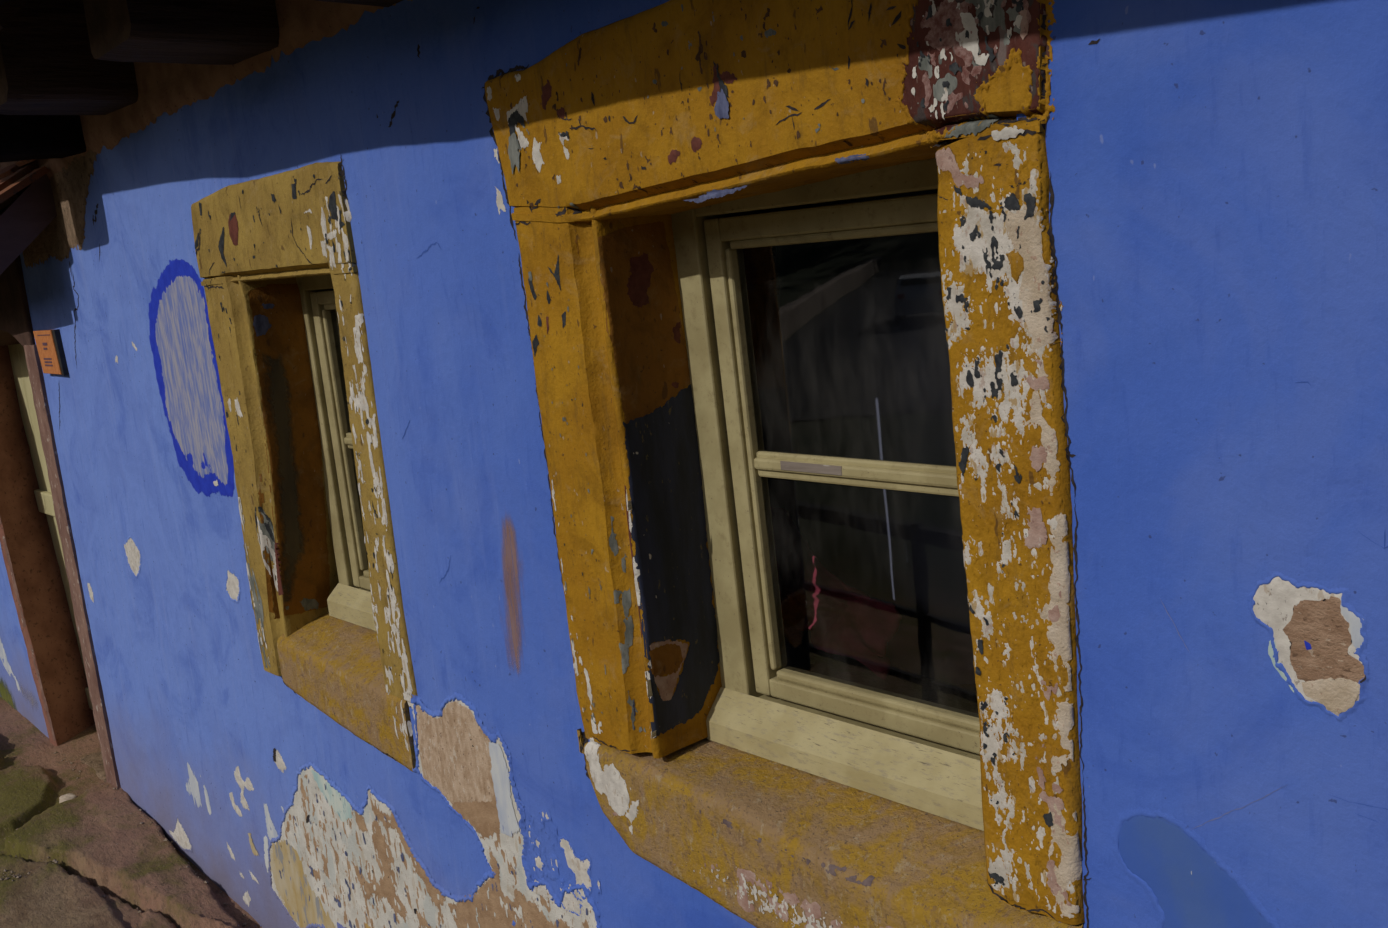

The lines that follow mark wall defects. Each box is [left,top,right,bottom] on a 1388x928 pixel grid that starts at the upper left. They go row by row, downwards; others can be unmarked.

peeling [487,47,614,215]
peeling [195,176,356,290]
peeling [528,255,569,356]
peeling [832,0,1082,920]
peeling [0,519,55,741]
peeling [225,295,602,928]
peeling [561,485,656,834]
spalling [1247,571,1372,722]
peeling [673,862,859,928]